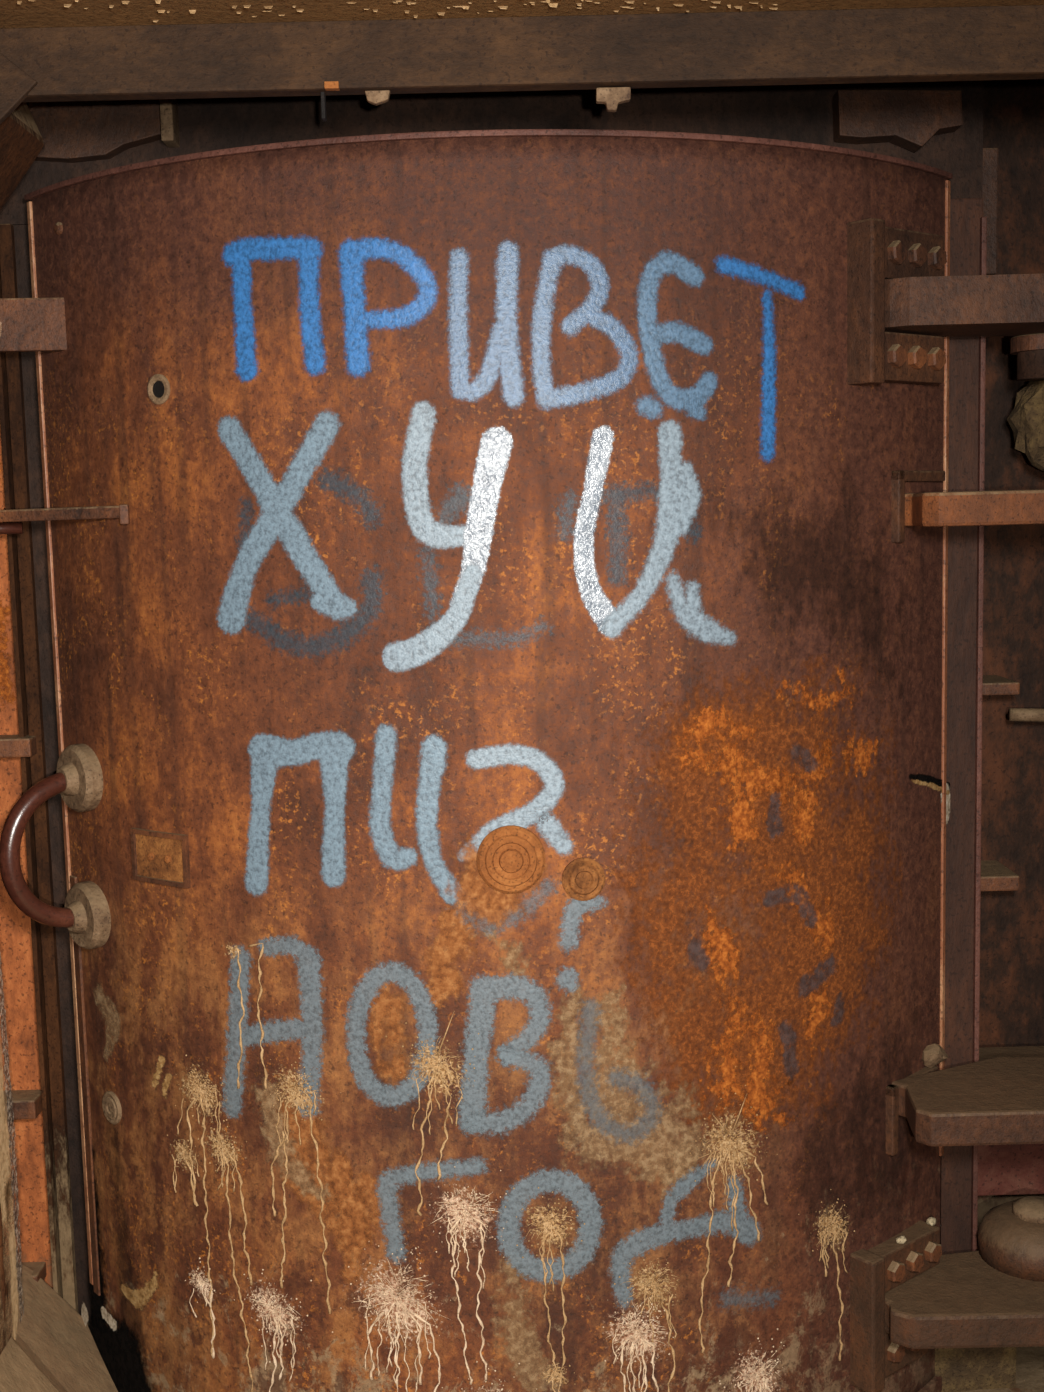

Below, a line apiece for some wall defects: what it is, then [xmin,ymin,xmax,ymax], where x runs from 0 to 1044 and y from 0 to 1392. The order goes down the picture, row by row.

corrosion [426,838,546,1006]
corrosion [613,657,901,1138]
corrosion [369,982,407,1079]
peeling [0,1048,19,1351]
corrosion [255,1078,388,1283]